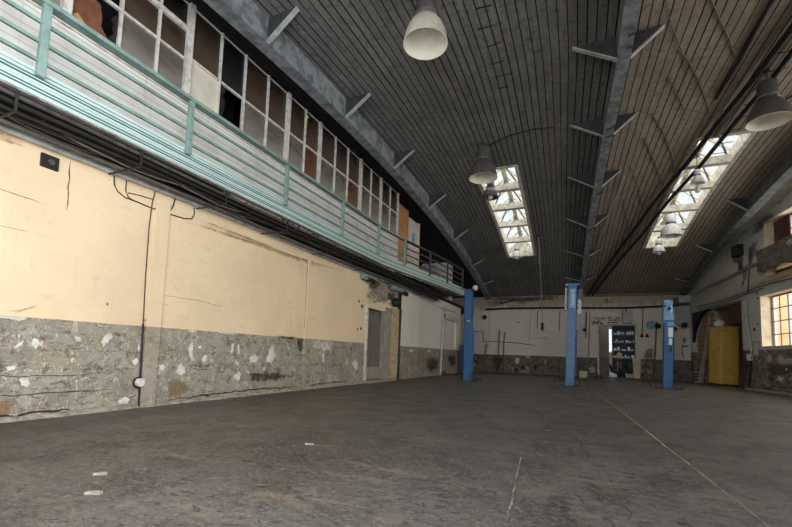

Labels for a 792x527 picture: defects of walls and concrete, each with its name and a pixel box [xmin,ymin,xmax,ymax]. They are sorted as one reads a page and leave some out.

spalling [14,334,44,350]
crack [0,369,110,417]